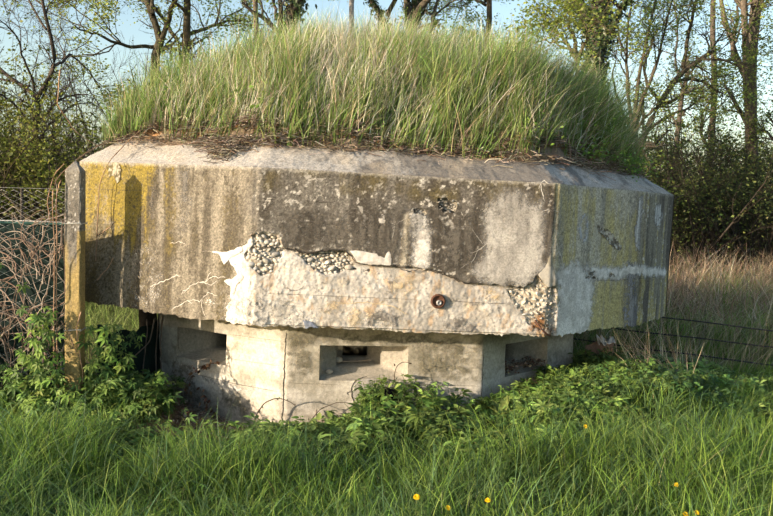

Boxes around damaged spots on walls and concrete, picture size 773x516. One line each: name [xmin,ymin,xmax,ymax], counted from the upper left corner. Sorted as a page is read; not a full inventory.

efflorescence [655,205,663,226]
spalling [212,191,558,337]
crack [150,272,220,315]
corrosion [529,313,552,337]
crack [280,331,288,420]